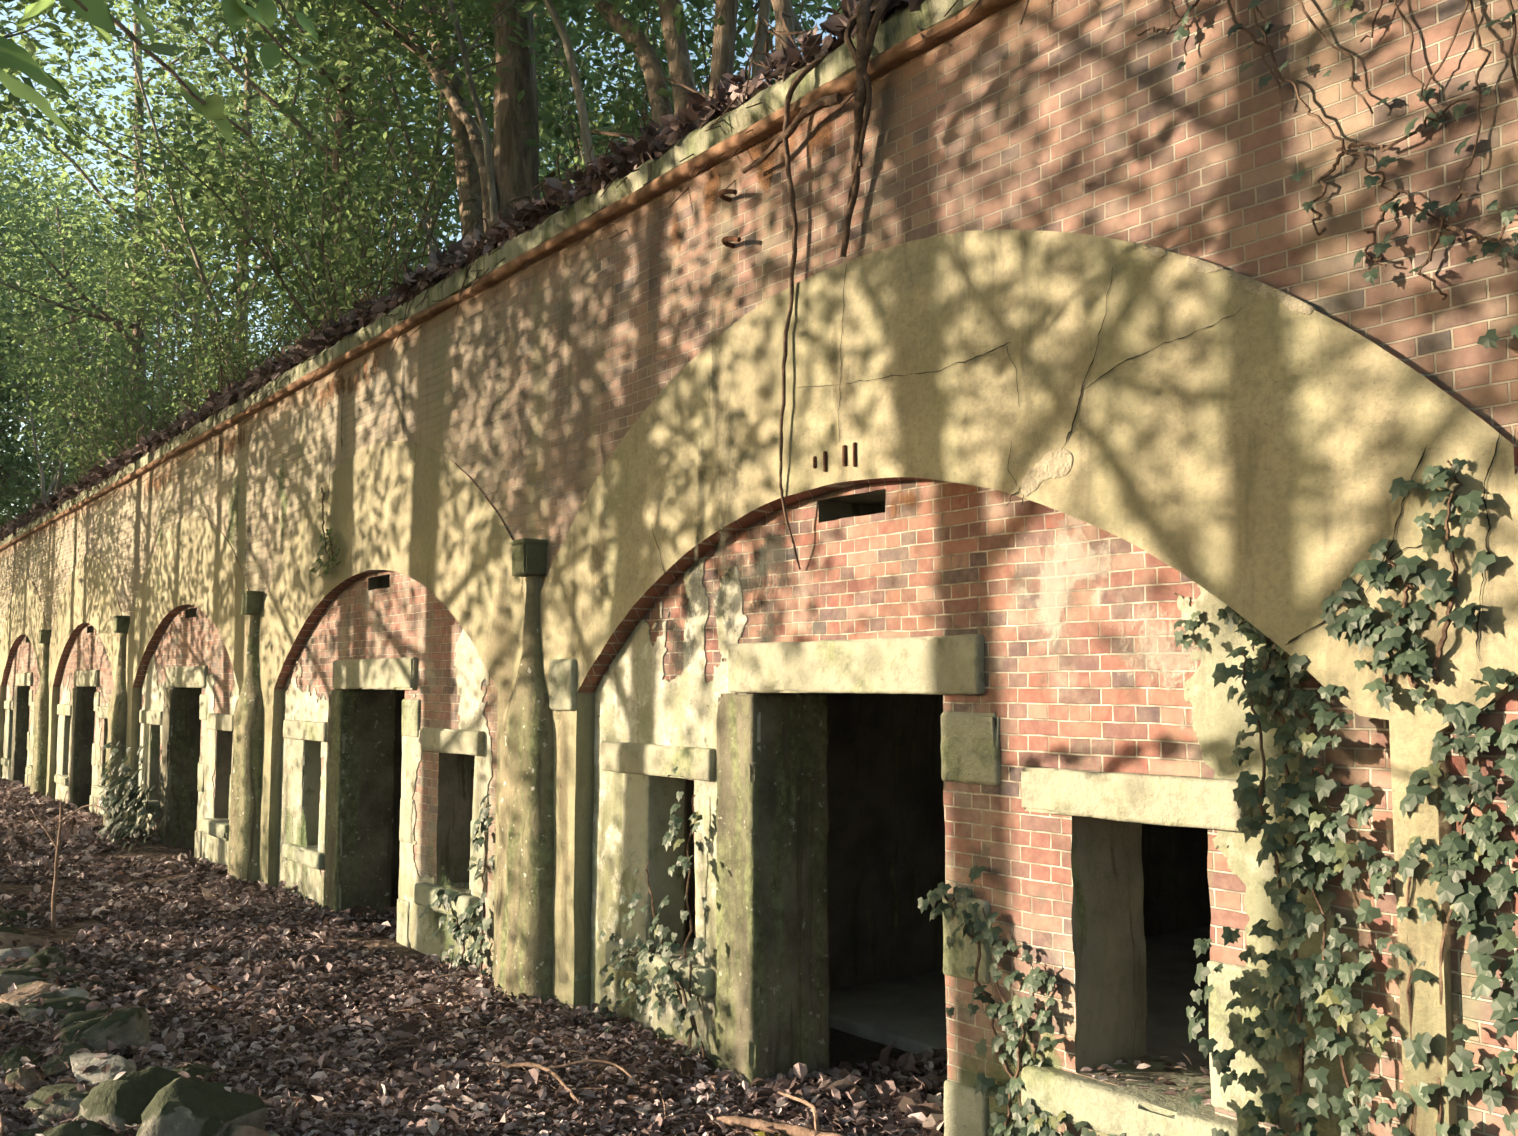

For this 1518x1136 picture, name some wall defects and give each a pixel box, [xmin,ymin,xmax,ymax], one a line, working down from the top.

rust [704,168,720,216]
rust [750,120,831,193]
crack [799,264,1020,441]
crack [1007,268,1242,505]
leakage [671,317,795,671]
crack [1285,445,1445,645]
crack [1475,426,1501,661]